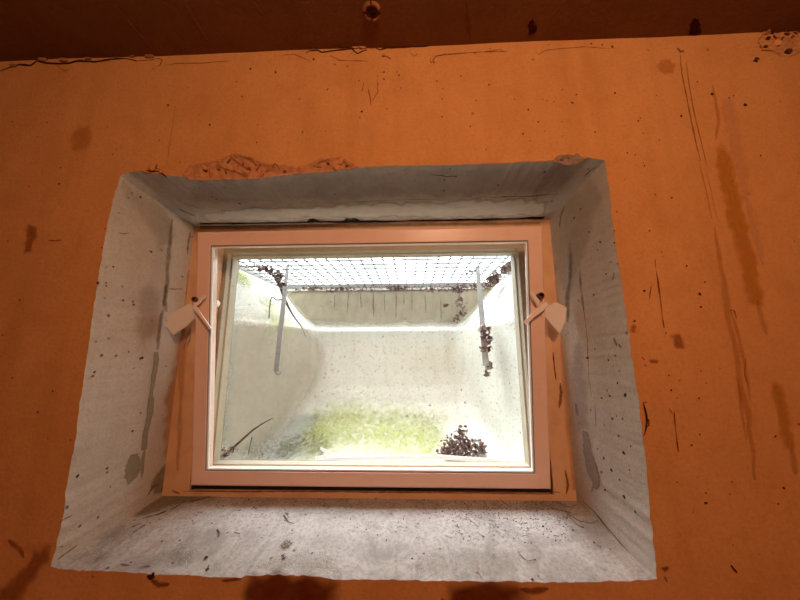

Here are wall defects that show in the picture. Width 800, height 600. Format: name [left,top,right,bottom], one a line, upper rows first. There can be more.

spalling [755,29,800,60]
crack [1,54,177,71]
spalling [183,154,356,181]
damp [718,150,761,302]